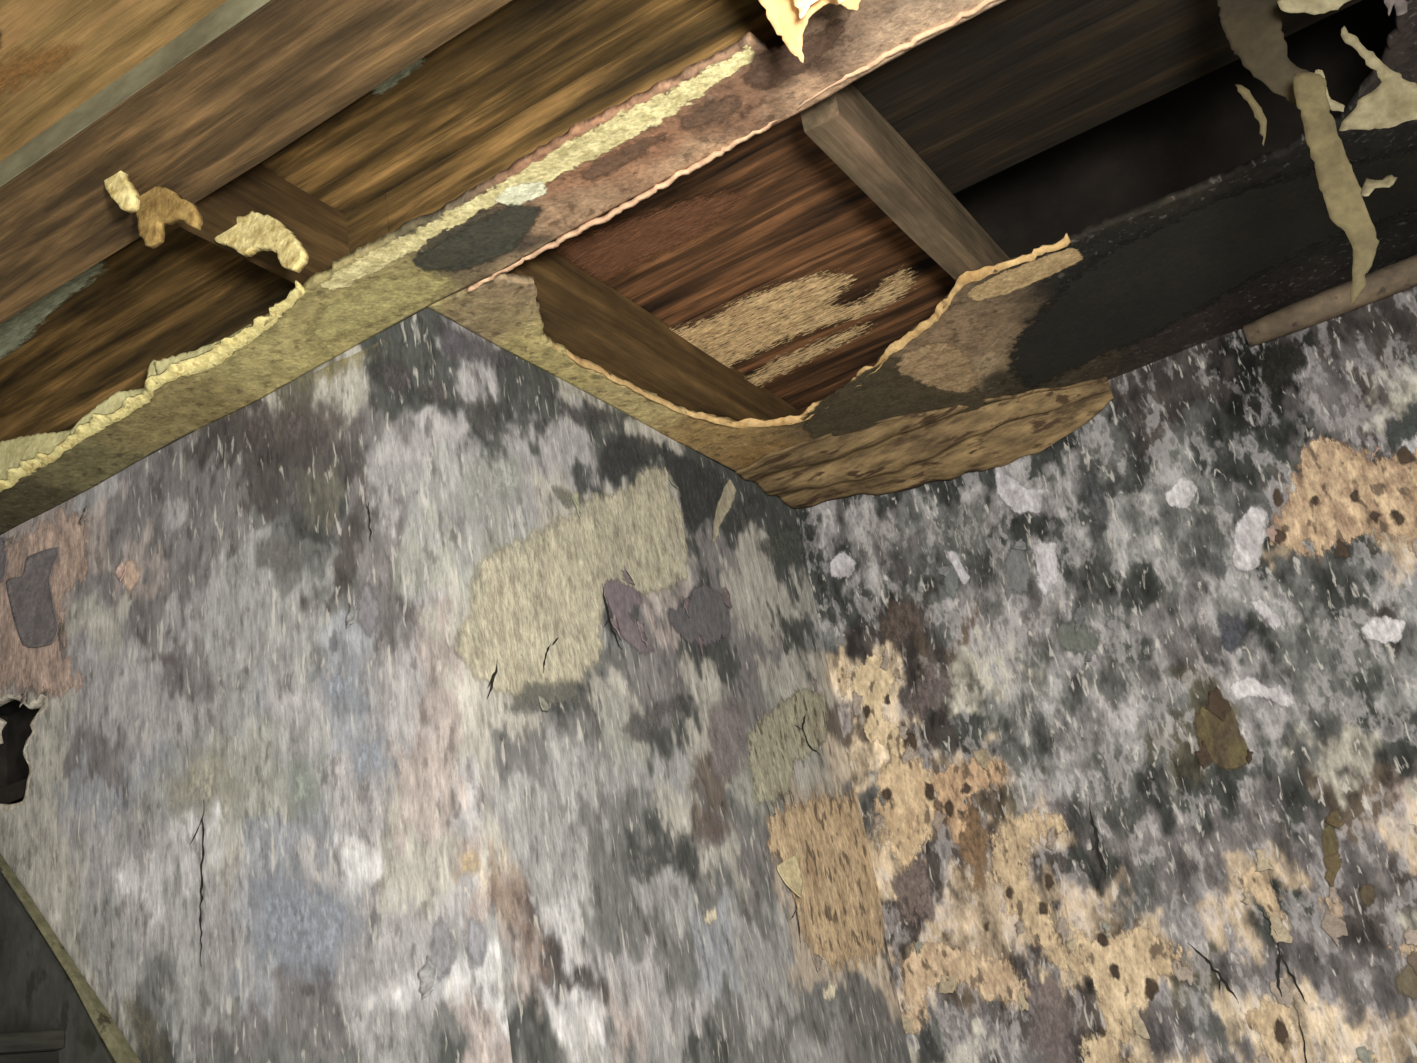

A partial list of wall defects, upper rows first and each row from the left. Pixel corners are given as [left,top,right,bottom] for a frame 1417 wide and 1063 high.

peeling [494,181,547,206]
spalling [1232,434,1417,571]
spalling [0,507,89,811]
spalling [456,466,732,711]
spalling [1193,676,1295,770]
crack [190,800,204,967]
spalling [747,645,1009,1001]
spalling [901,922,1031,1035]
spalling [988,806,1193,1063]
crack [1188,943,1239,1004]
spalling [1234,849,1293,943]
crack [1260,909,1307,1063]